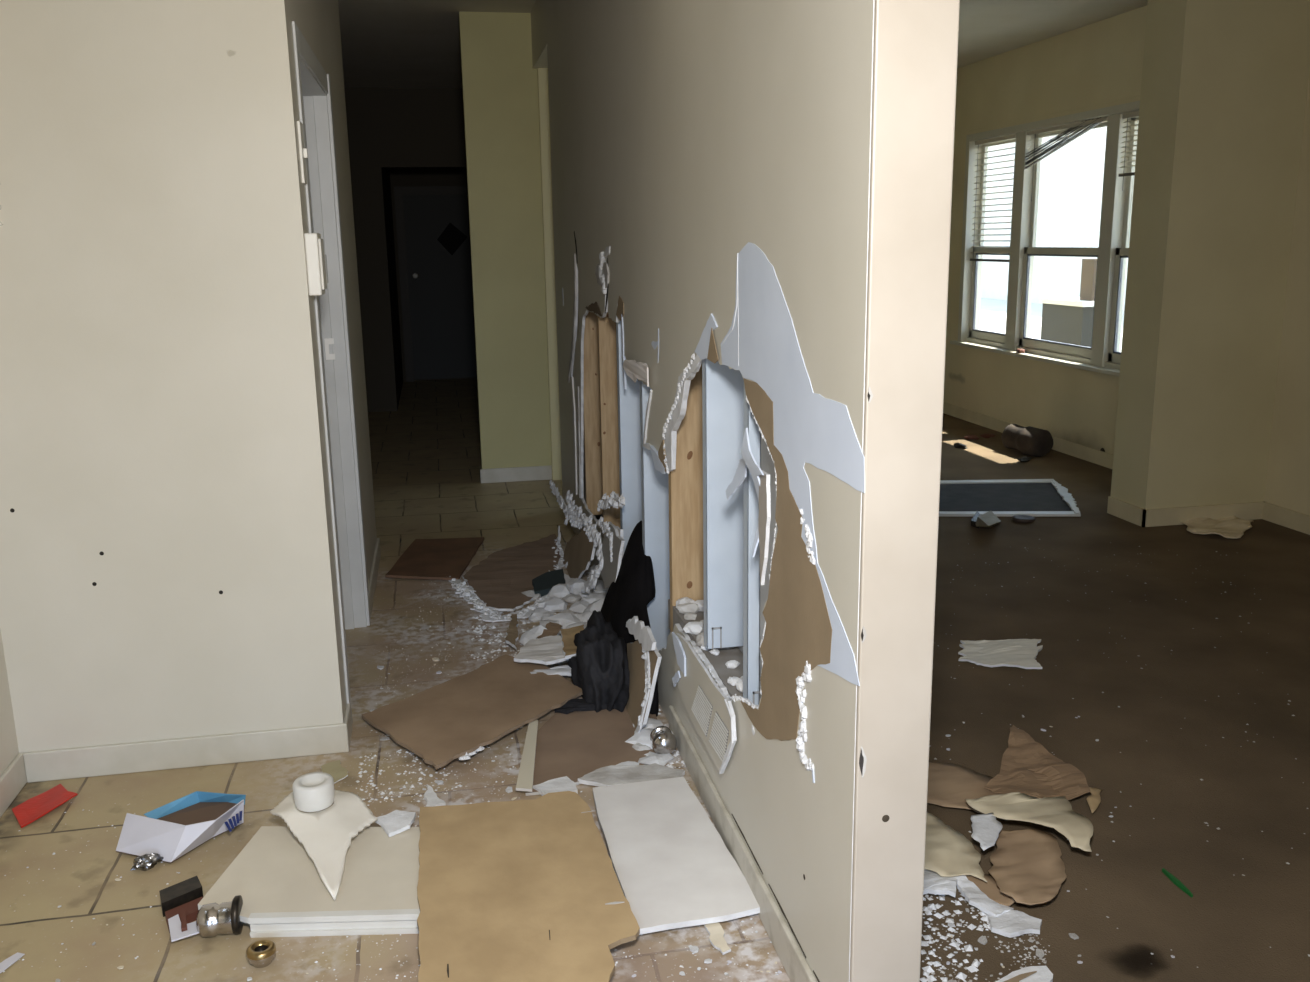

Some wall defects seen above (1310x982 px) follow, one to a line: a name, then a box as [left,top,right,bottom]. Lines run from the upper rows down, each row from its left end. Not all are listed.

flaking render [595,246,610,313]
spalling [643,353,702,474]
peeling [721,242,865,783]